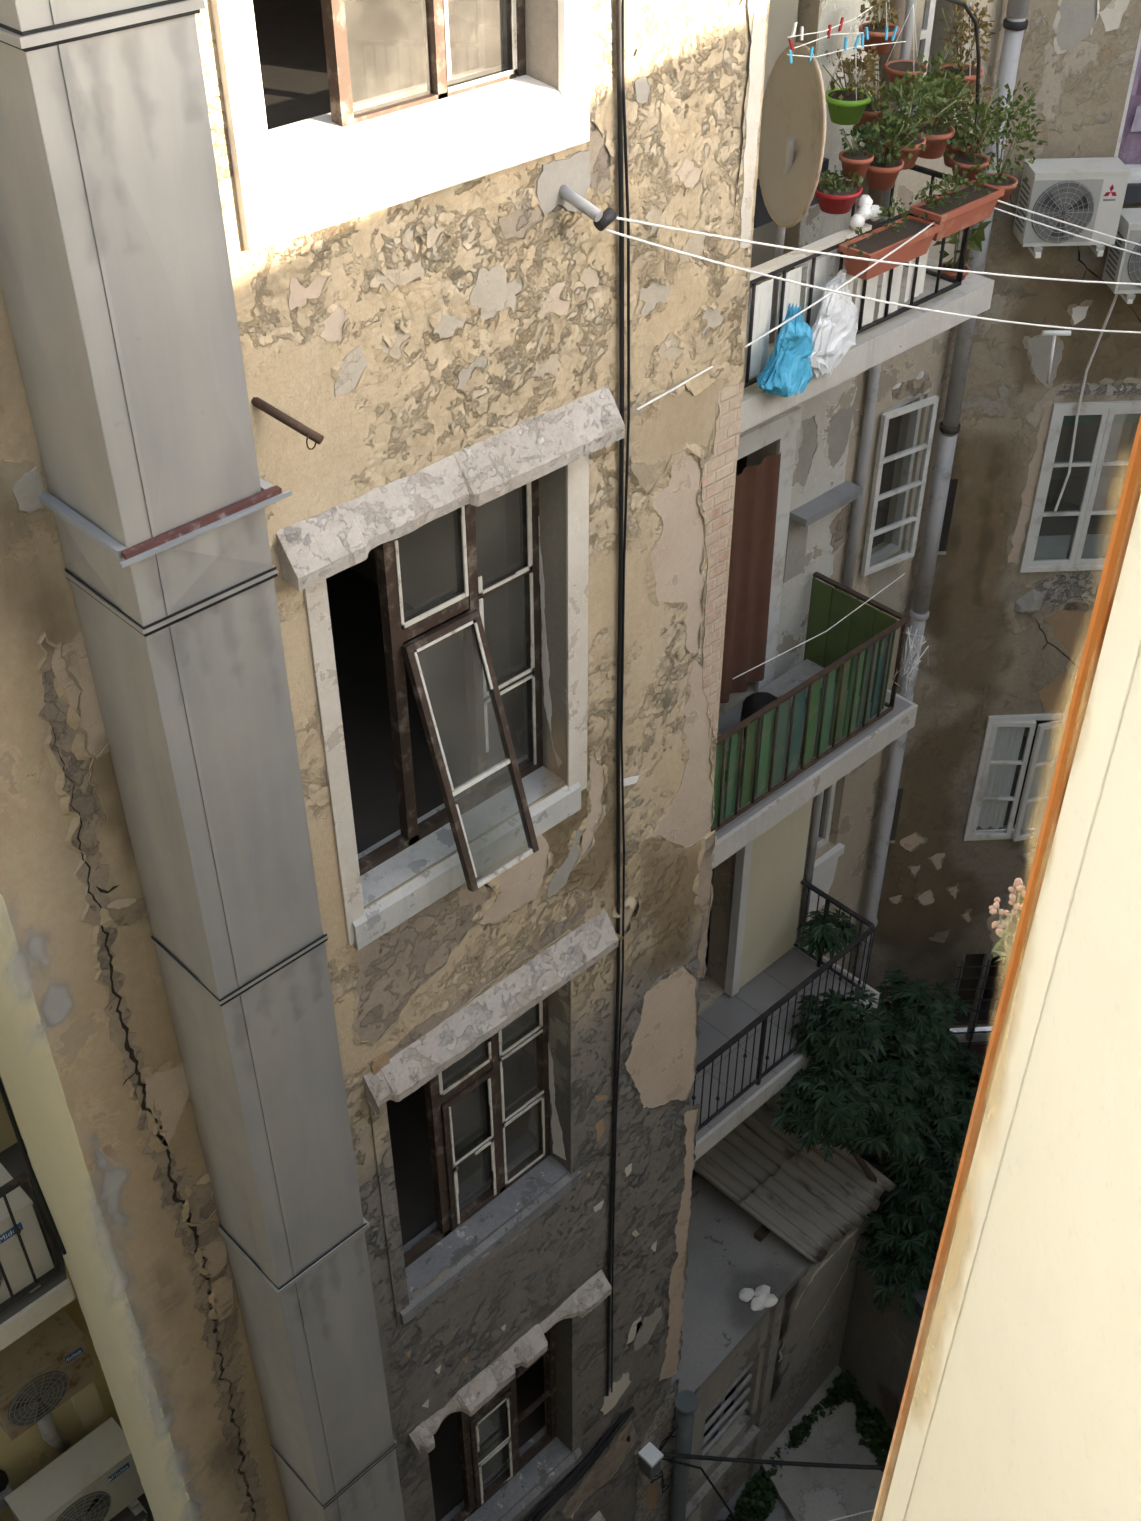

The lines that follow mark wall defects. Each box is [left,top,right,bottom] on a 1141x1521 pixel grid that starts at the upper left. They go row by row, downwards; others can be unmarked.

flaking render [1053,0,1130,55]
peeling [366,212,454,296]
flaking render [495,195,544,245]
flaking render [587,111,617,200]
peeling [643,202,665,243]
peeling [634,223,713,319]
peeling [676,158,710,196]
flaking render [288,259,603,397]
flaking render [559,302,745,1521]
flaking render [888,831,1016,957]
crack [48,695,257,1521]